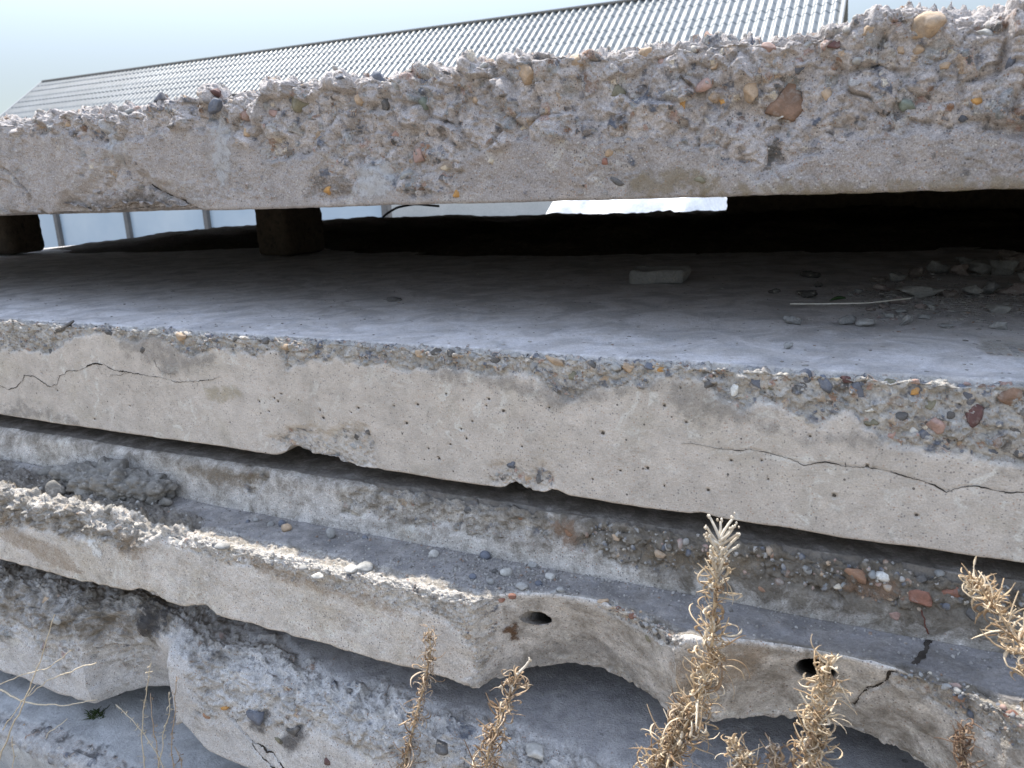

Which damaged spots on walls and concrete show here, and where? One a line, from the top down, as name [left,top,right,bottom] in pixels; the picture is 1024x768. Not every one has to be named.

spalling [0,0,1024,202]
crack [3,363,215,390]
spalling [0,318,1024,467]
crack [681,443,1024,494]
spalling [0,459,505,678]
rust [503,623,519,640]
spalling [597,598,683,648]
crack [853,610,933,705]